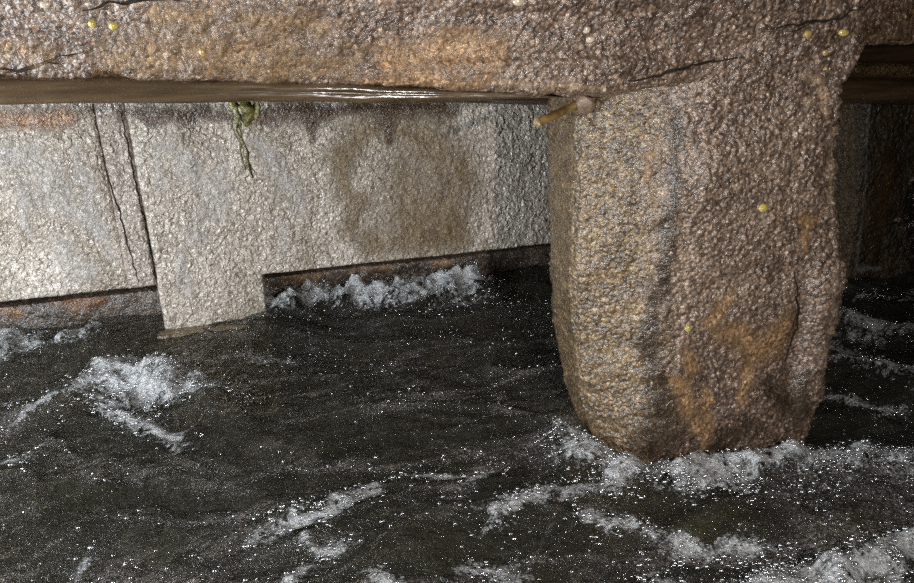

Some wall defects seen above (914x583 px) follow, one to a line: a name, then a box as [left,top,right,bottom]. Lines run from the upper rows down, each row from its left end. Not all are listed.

crack [628,57,744,82]
crack [92,103,157,282]